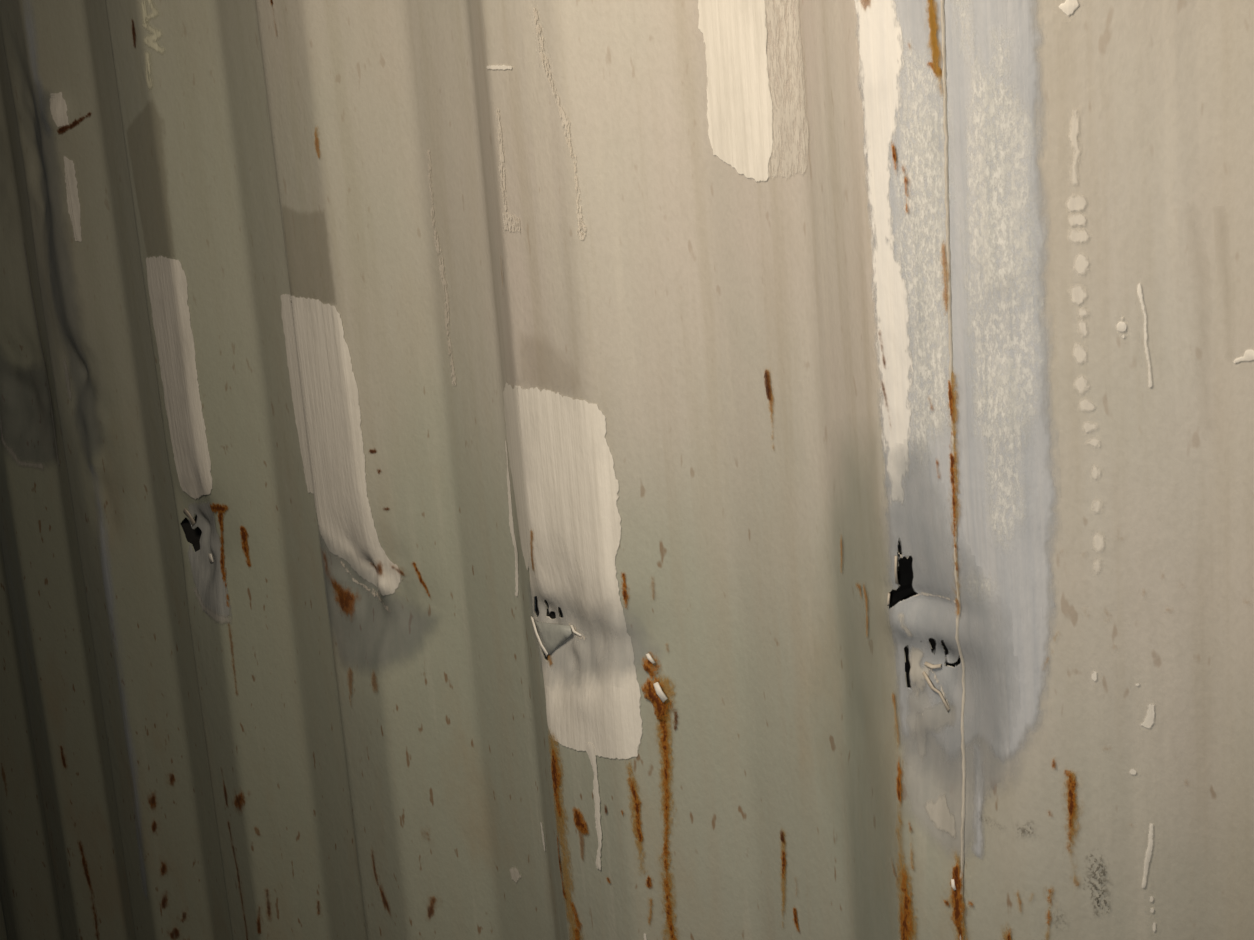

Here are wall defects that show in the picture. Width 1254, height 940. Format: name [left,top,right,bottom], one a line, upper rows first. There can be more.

corrosion [928,0,942,88]
corrosion [764,370,773,419]
corrosion [210,503,229,607]
corrosion [240,526,251,566]
corrosion [324,556,355,615]
peeling [900,614,929,694]
corrosion [549,738,588,940]
corrosion [605,764,643,856]
corrosion [642,653,677,940]
corrosion [1052,759,1077,847]
corrosion [897,850,916,940]
corrosion [943,855,973,940]